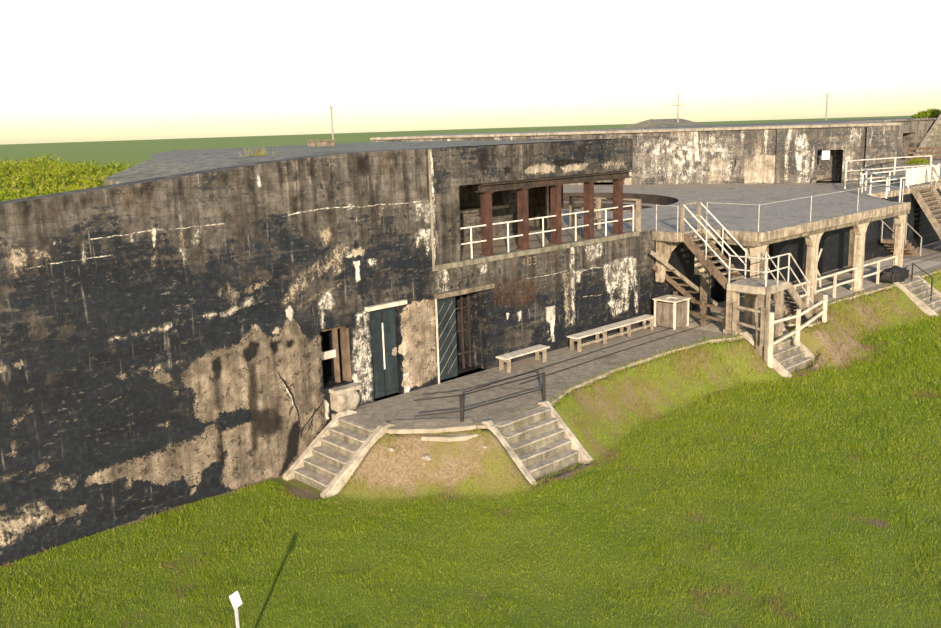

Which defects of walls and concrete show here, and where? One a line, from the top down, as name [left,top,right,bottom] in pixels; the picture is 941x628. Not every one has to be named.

water stain [643,131,736,180]
water stain [784,134,811,183]
water stain [332,259,376,282]
water stain [318,291,333,328]
spalling [54,227,349,495]
water stain [212,358,222,404]
water stain [243,340,300,476]
crack [278,372,323,437]
peeling [352,312,372,401]
spalling [392,298,437,393]